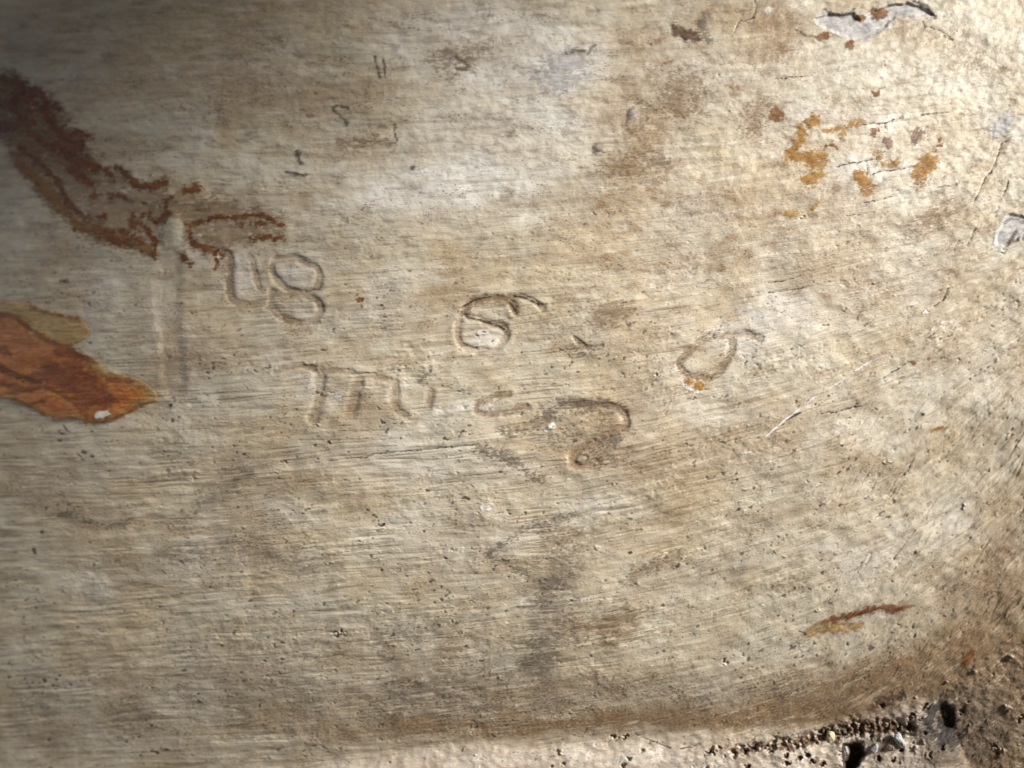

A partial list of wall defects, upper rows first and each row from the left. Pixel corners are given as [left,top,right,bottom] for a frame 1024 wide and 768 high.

spalling [796,0,938,50]
corrosion [0,75,286,270]
corrosion [769,105,943,218]
flaking render [992,213,1024,248]
corrosion [0,300,158,423]
corrosion [806,600,913,637]